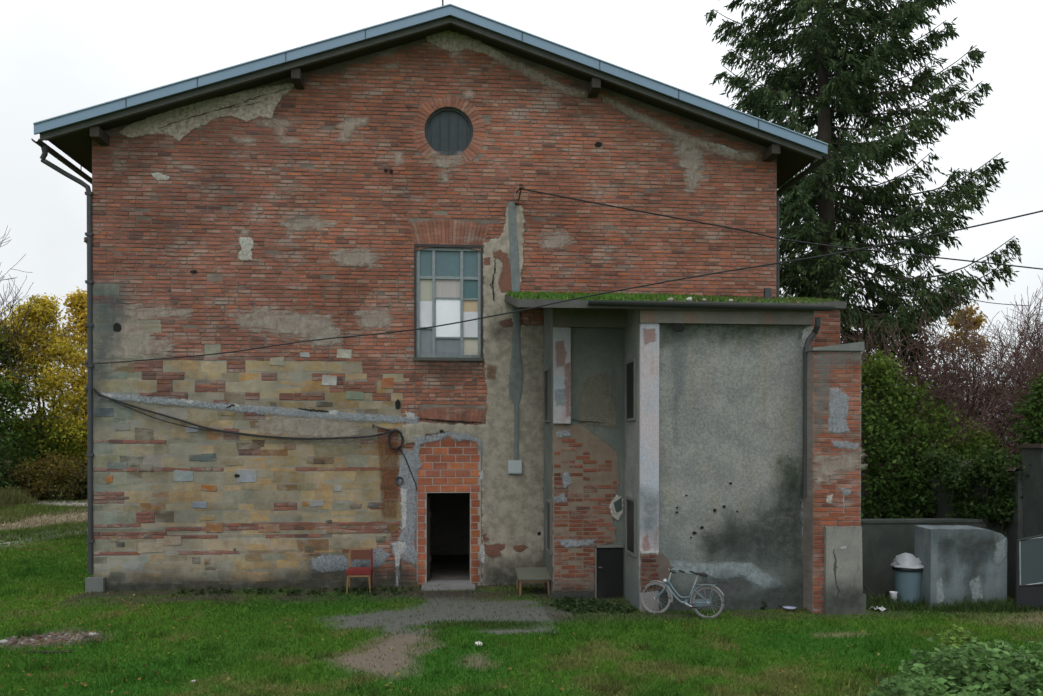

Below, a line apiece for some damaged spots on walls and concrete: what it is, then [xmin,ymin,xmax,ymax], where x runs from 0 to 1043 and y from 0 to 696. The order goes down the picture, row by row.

flaking render [426,30,586,97]
flaking render [119,83,302,143]
flaking render [600,94,759,161]
flaking render [483,250,512,293]
damp [813,450,867,484]
peeling [392,542,407,585]